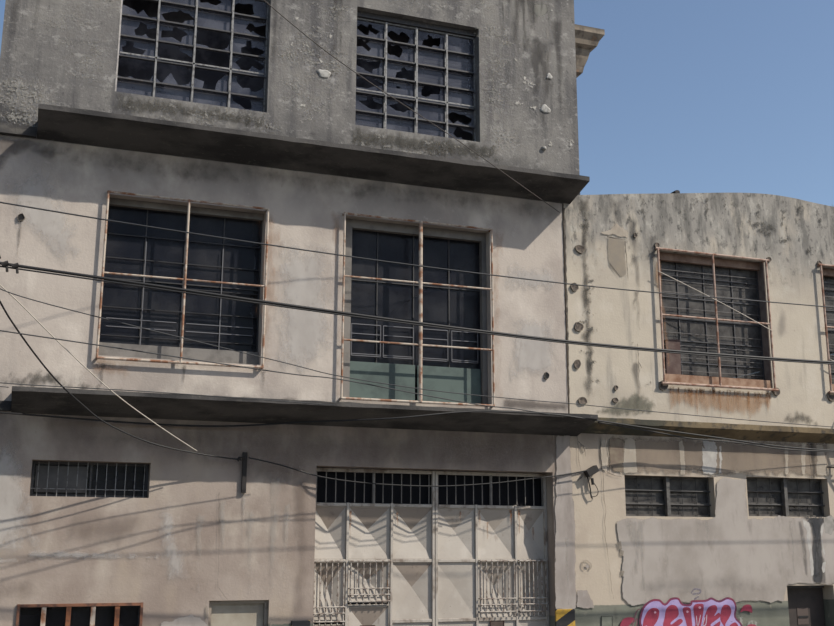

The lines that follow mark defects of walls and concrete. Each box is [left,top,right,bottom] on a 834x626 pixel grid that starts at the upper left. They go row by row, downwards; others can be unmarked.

water stain [602,224,628,276]
water stain [579,276,600,388]
rust [678,388,770,410]
peeling [600,440,609,471]
peeling [623,437,637,473]
peeling [702,440,723,475]
peeling [816,445,828,476]
water stain [617,477,834,606]
peeling [803,520,826,576]